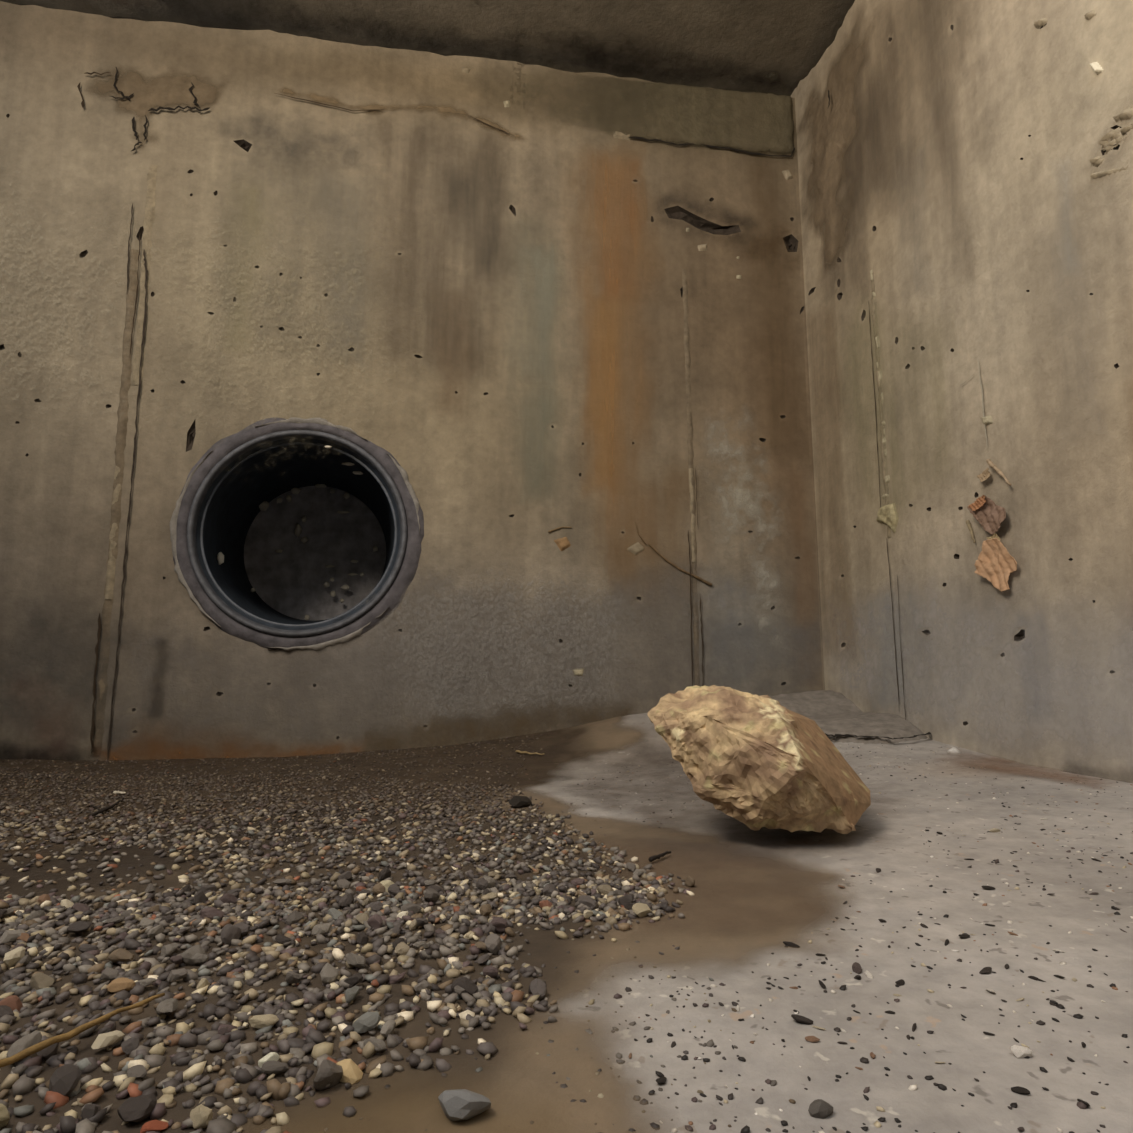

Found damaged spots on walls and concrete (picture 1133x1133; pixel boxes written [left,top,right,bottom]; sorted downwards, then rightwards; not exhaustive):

crack [275,93,378,111]
spalling [1089,107,1133,179]
spalling [651,206,741,235]